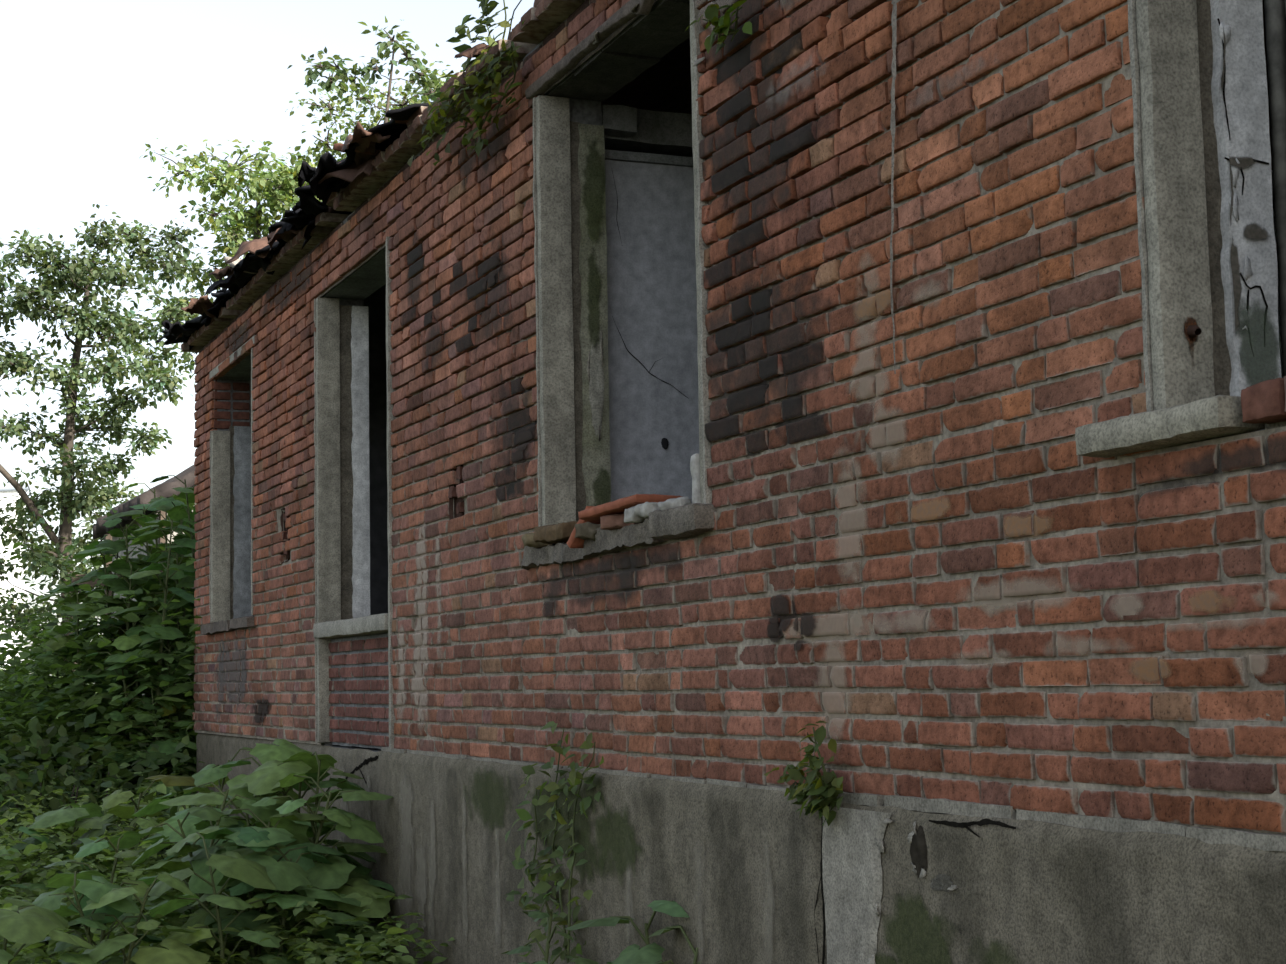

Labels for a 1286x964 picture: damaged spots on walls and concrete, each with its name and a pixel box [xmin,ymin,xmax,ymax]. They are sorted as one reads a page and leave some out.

crack [1217,18,1269,195]
crack [890,0,900,374]
crack [1240,273,1268,315]
corrosion [1184,317,1198,349]
flaking render [822,806,893,964]
spalling [908,821,958,892]
crack [929,818,1016,838]